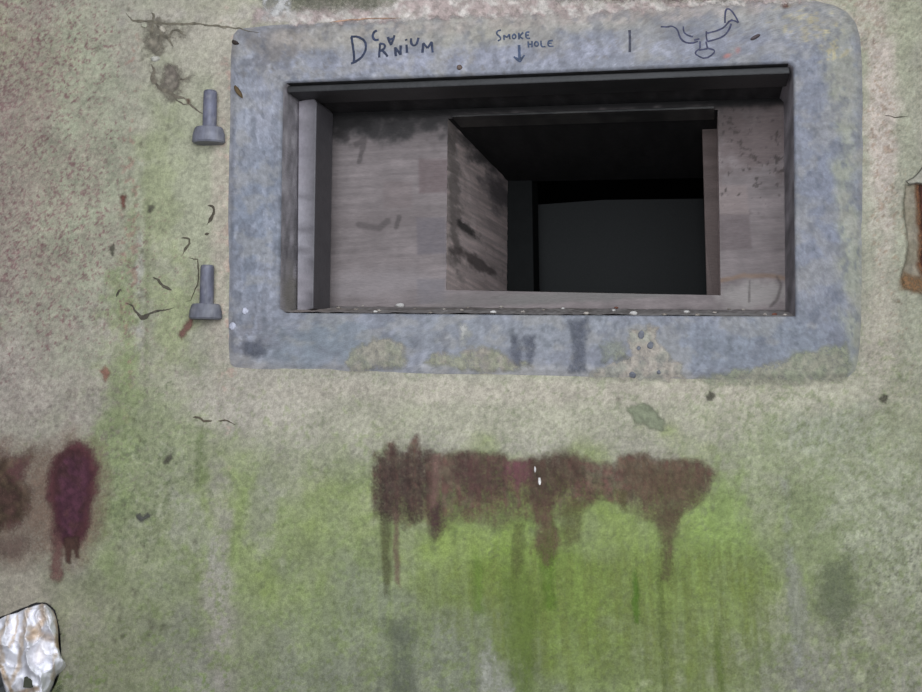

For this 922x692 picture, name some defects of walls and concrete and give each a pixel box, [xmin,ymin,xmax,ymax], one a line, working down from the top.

crack [128,12,259,46]
crack [150,64,203,114]
rust [901,184,922,291]
rust [0,442,99,580]
rust [373,437,713,585]